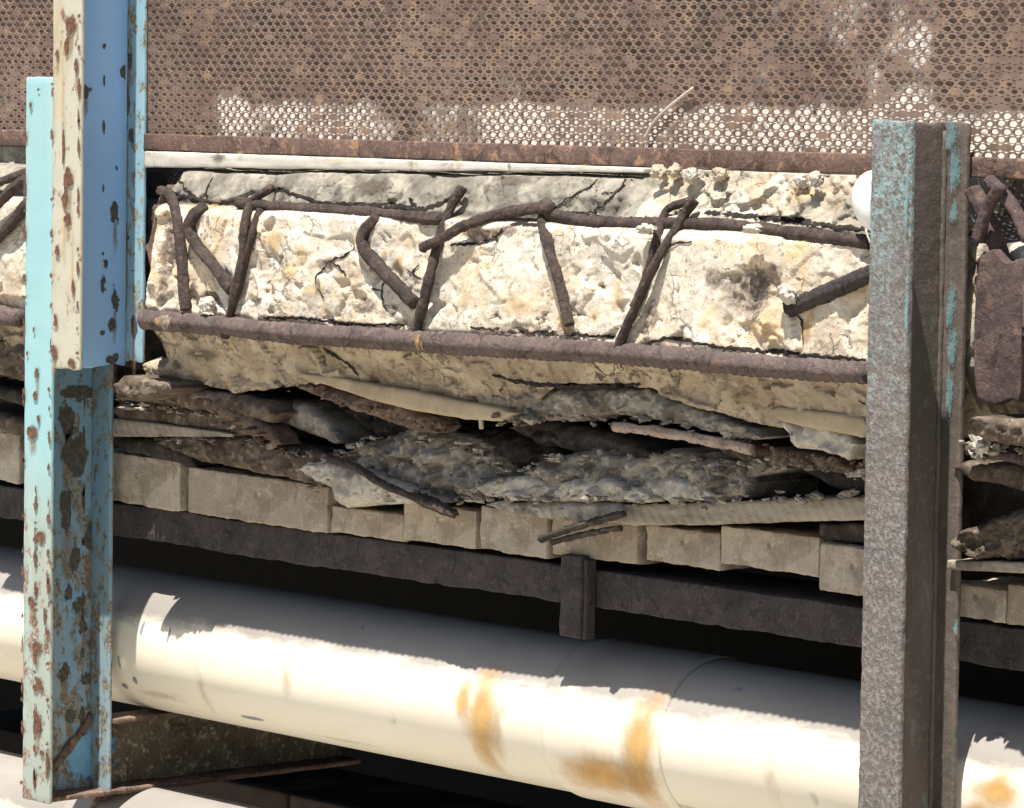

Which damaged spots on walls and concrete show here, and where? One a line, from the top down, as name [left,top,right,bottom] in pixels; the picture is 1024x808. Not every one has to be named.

rust [54,15,92,109]
rust [120,53,134,145]
rust [61,130,73,236]
crack [450,173,645,247]
spalling [155,224,176,301]
spalling [191,279,219,302]
crack [263,247,406,327]
spalling [353,297,397,314]
spalling [704,265,782,322]
rust [58,385,93,478]
peeling [775,421,866,460]
rust [578,720,649,792]